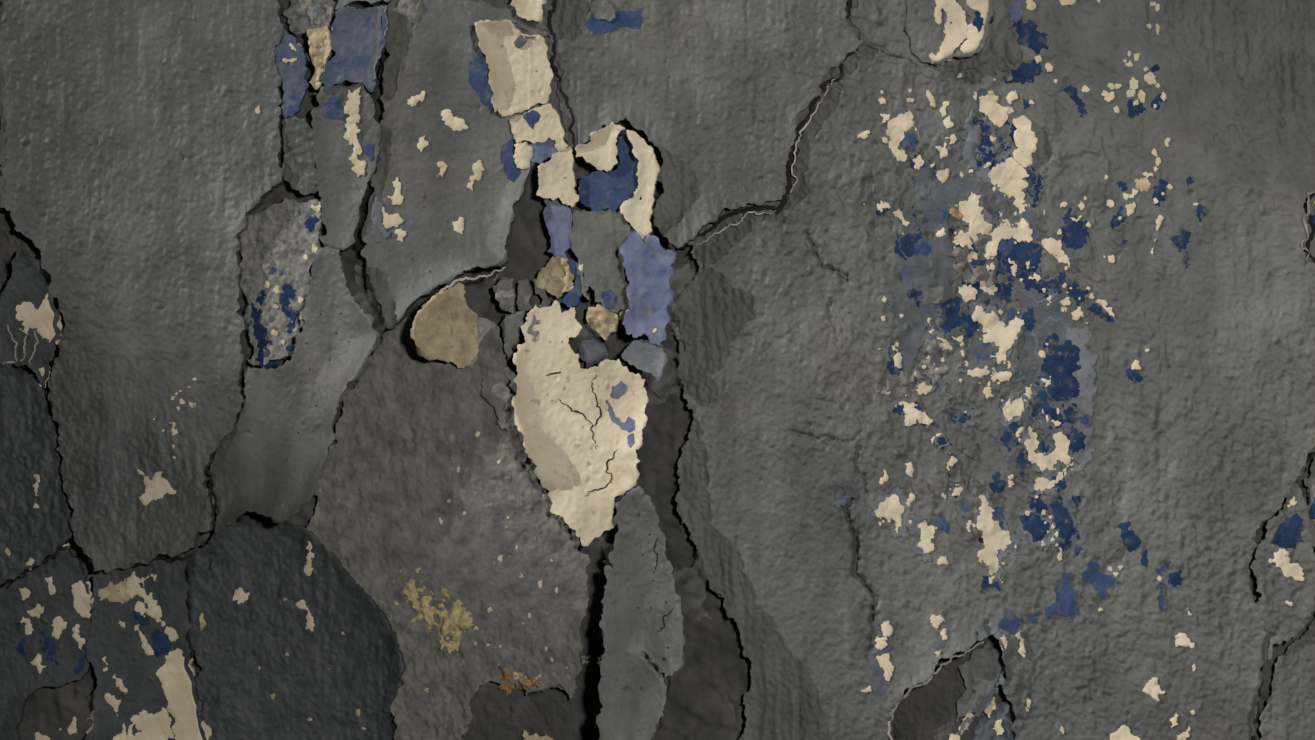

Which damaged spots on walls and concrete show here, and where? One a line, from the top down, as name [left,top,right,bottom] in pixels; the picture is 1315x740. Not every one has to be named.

spalling [239,198,324,370]
peeling [274,0,389,177]
spalling [304,103,678,740]
peeling [511,0,549,48]
crack [683,48,858,250]
crack [806,232,849,282]
crack [845,0,853,19]
peeling [832,0,1184,740]
crack [1306,194,1315,263]
crack [2,389,244,657]
peeling [13,571,212,740]
crack [1252,665,1263,740]